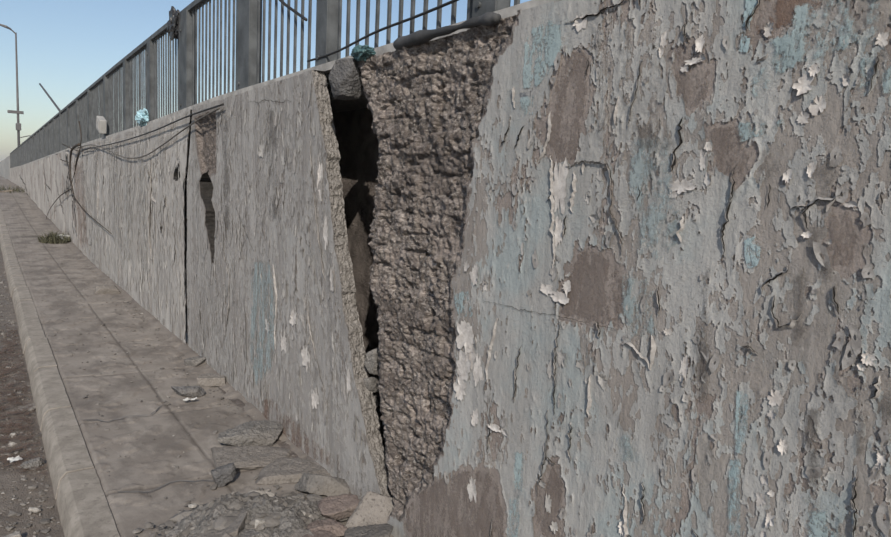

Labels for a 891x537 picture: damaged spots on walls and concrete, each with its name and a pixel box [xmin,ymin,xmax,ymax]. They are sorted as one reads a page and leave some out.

crack [573,0,641,21]
peeling [658,30,709,106]
peeling [739,0,819,52]
peeling [792,62,826,124]
crack [183,117,191,213]
crack [181,238,189,339]
crack [271,266,279,350]
crack [326,79,386,453]
spalling [358,10,520,537]
crack [719,164,738,258]
peeling [800,231,832,268]
peeling [829,324,877,371]